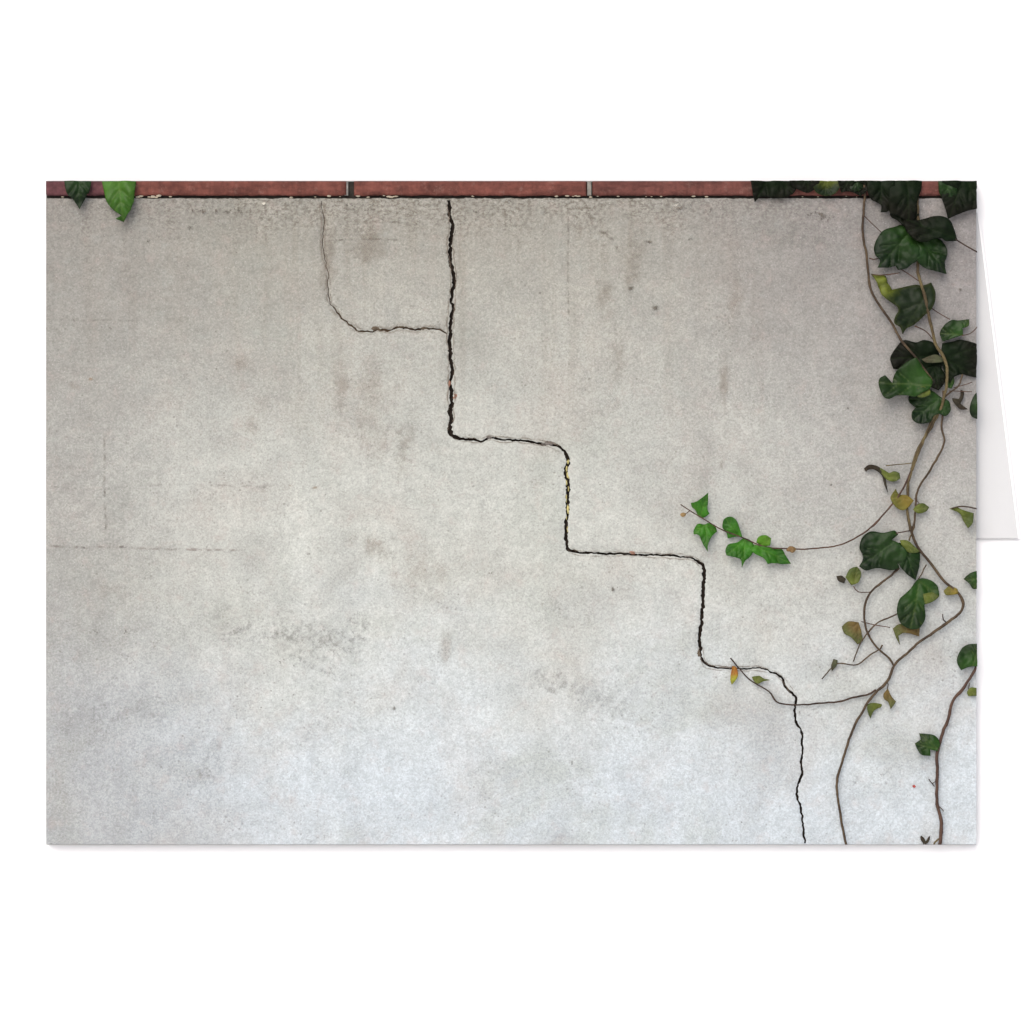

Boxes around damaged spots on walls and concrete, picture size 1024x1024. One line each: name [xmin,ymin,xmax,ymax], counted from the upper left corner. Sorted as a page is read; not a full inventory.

crack [321,200,806,843]